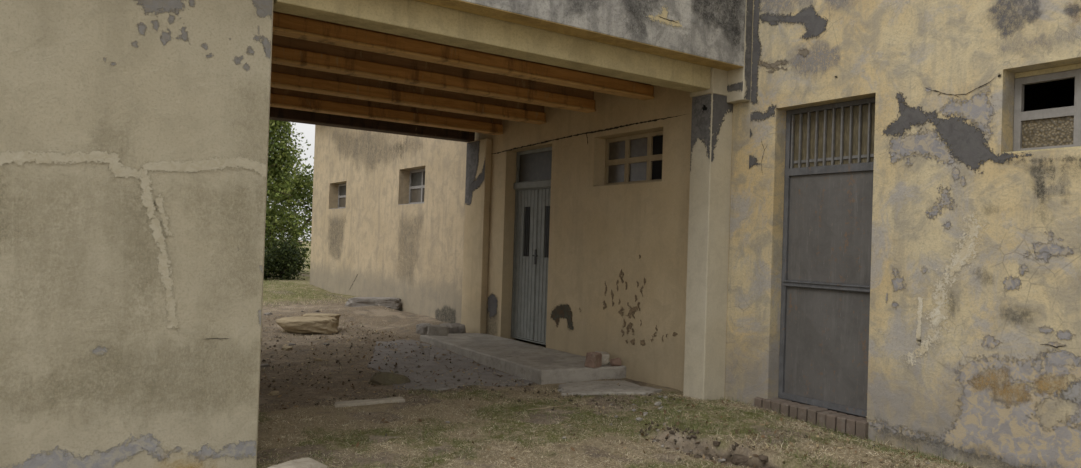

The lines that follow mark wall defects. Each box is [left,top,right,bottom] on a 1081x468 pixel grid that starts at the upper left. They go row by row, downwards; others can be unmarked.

peeling [131,0,214,58]
peeling [232,0,273,71]
flaking render [690,0,828,171]
crack [926,79,993,97]
flaking render [881,74,1032,230]
peeling [1003,231,1074,292]
peeling [550,304,581,330]
peeling [603,270,677,346]
peeling [866,326,1081,468]
peeling [4,433,256,468]